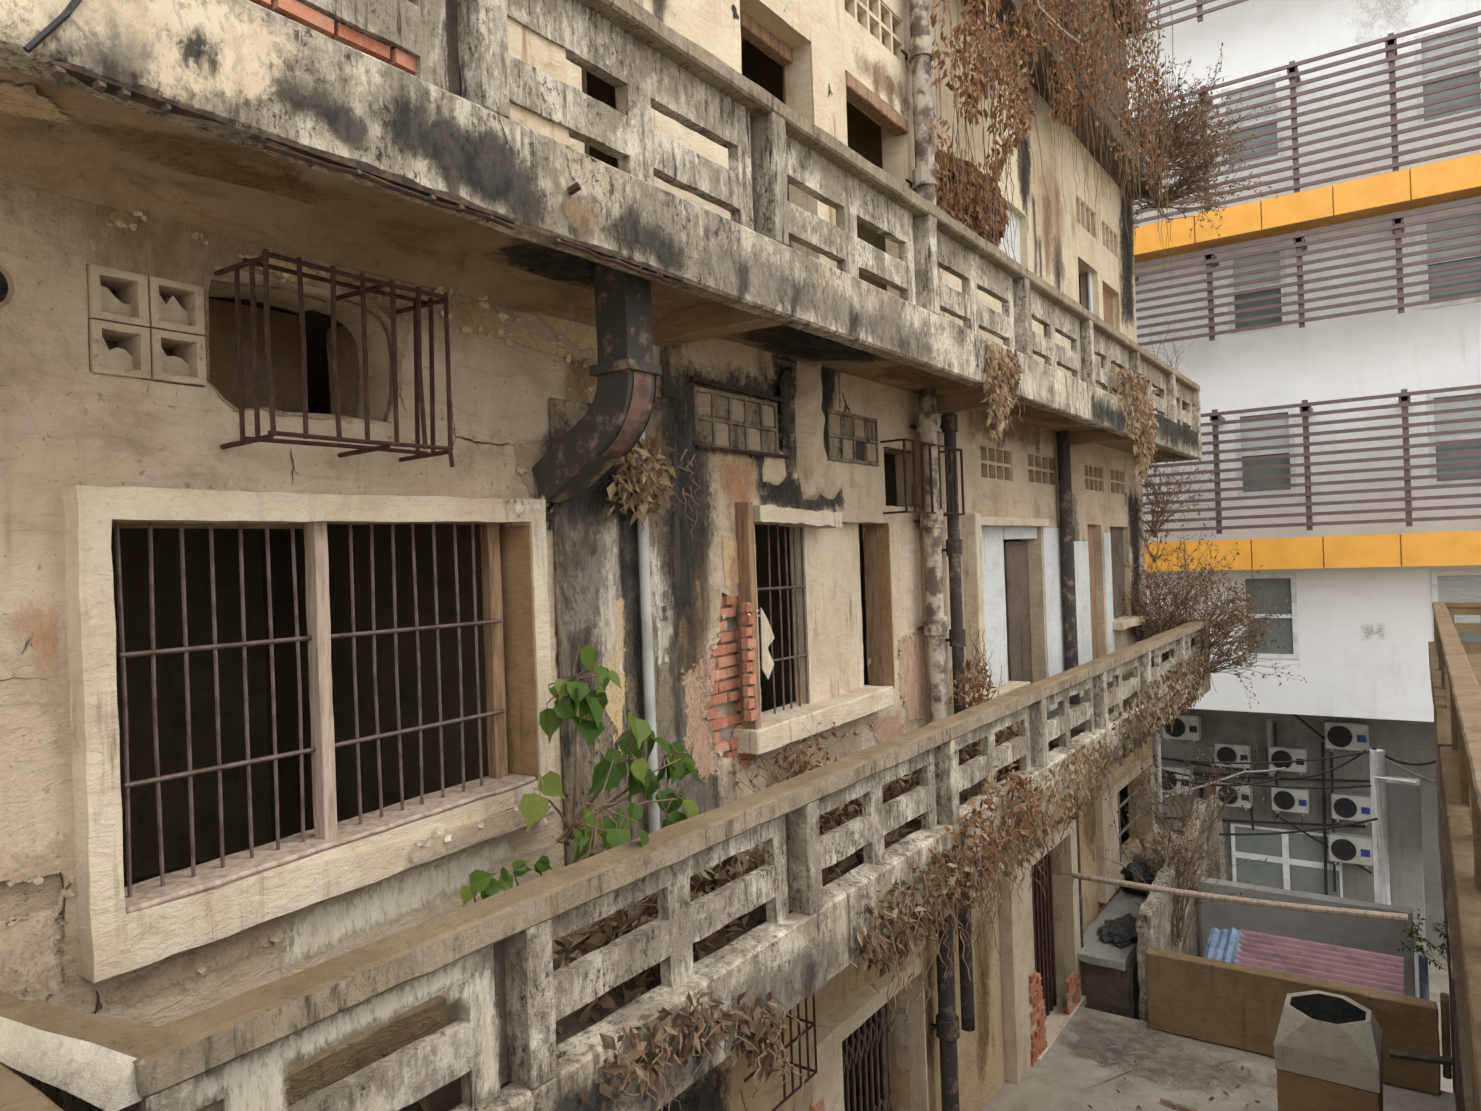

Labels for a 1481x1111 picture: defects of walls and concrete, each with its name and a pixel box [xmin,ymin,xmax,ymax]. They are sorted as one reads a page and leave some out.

peeling [0,81,70,130]
water stain [1018,135,1065,290]
water stain [1119,189,1135,328]
water stain [0,0,968,815]
corrosion [602,371,652,457]
flaking render [681,596,862,787]
peeling [897,630,927,723]
peeling [0,836,80,1007]
mould [549,936,844,1111]
flaking render [1029,970,1047,1067]
flaking render [1065,971,1081,1015]